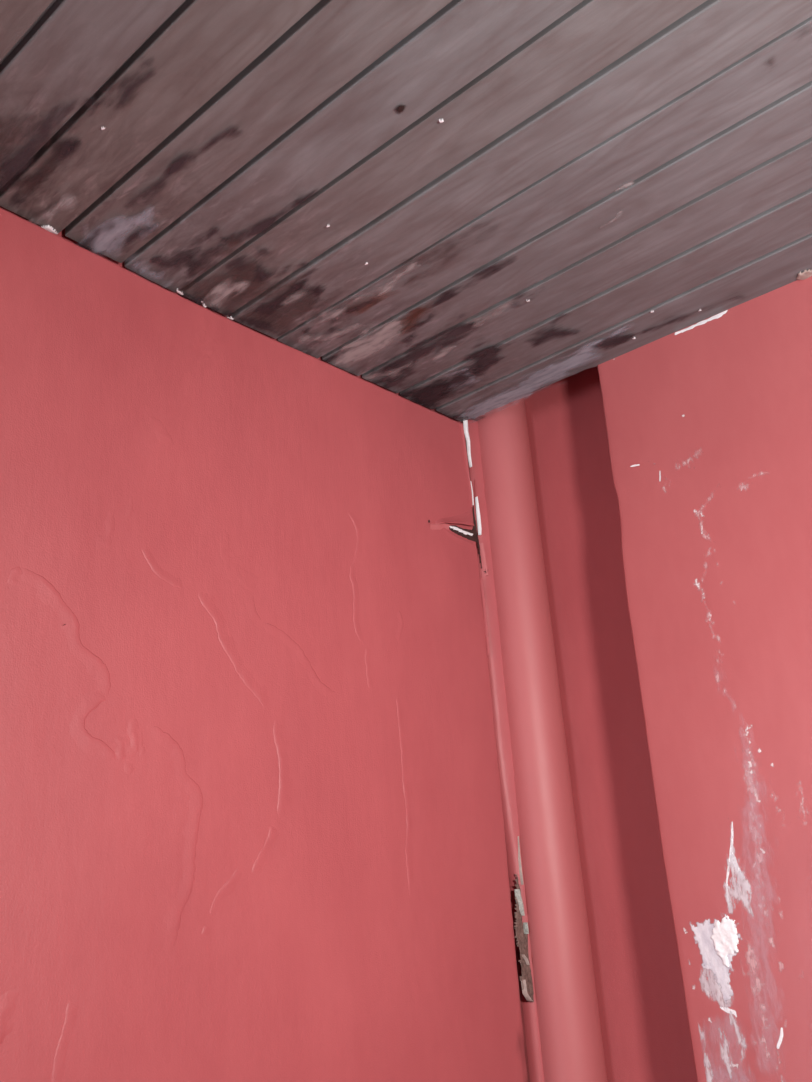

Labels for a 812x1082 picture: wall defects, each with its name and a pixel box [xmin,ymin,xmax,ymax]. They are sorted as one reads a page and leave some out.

damp [0,104,80,203]
damp [138,129,238,199]
damp [79,210,156,252]
damp [151,192,323,333]
damp [366,318,500,407]
damp [452,314,687,419]
crack [460,420,490,656]
spalling [514,836,534,1003]
peeling [683,822,753,1017]